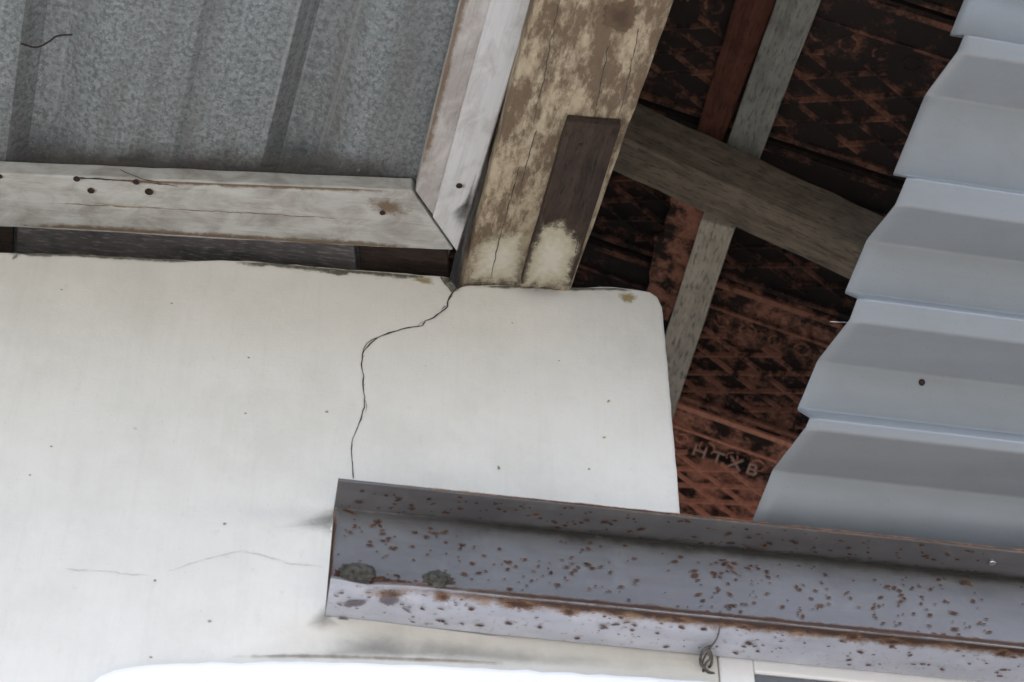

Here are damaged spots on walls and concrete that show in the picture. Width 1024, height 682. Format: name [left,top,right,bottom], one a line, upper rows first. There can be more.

crack [351,287,457,478]
rust [271,655,494,663]
rust [326,488,1024,677]